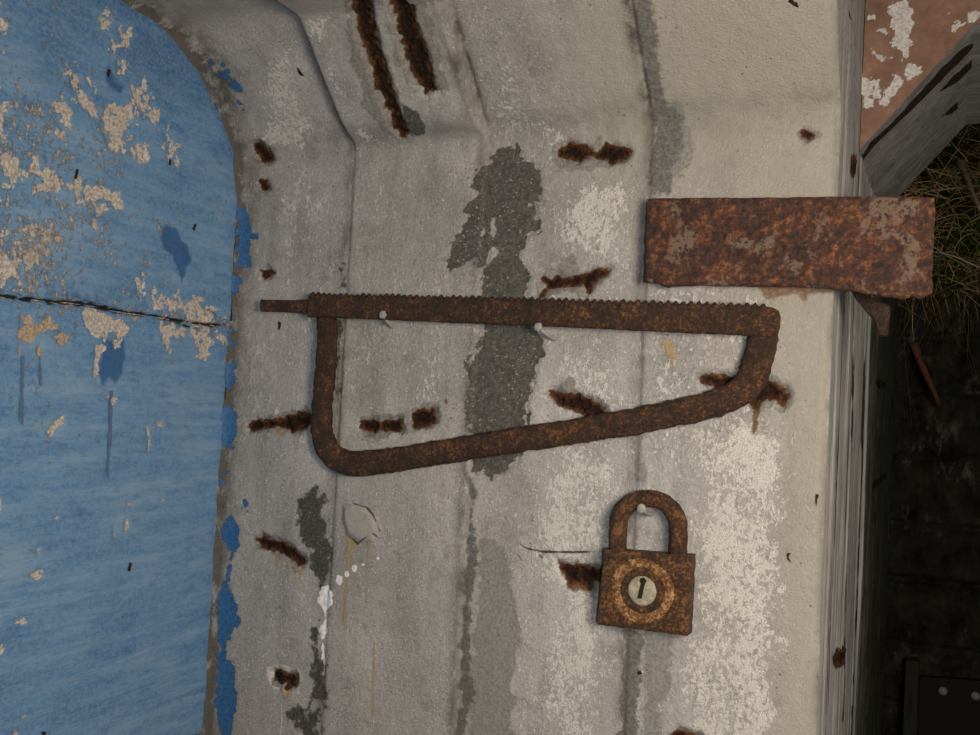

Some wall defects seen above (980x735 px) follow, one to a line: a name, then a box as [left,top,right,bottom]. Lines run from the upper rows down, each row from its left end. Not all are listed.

peeling [51,6,181,173]
water stain [632,0,692,195]
peeling [861,0,922,109]
peeling [951,10,980,33]
peeling [0,101,123,230]
peeling [0,254,18,285]
peeling [17,314,70,357]
peeling [82,307,130,377]
crack [0,294,232,330]
peeling [135,272,228,361]
water stain [285,485,364,735]
water stain [618,628,672,735]